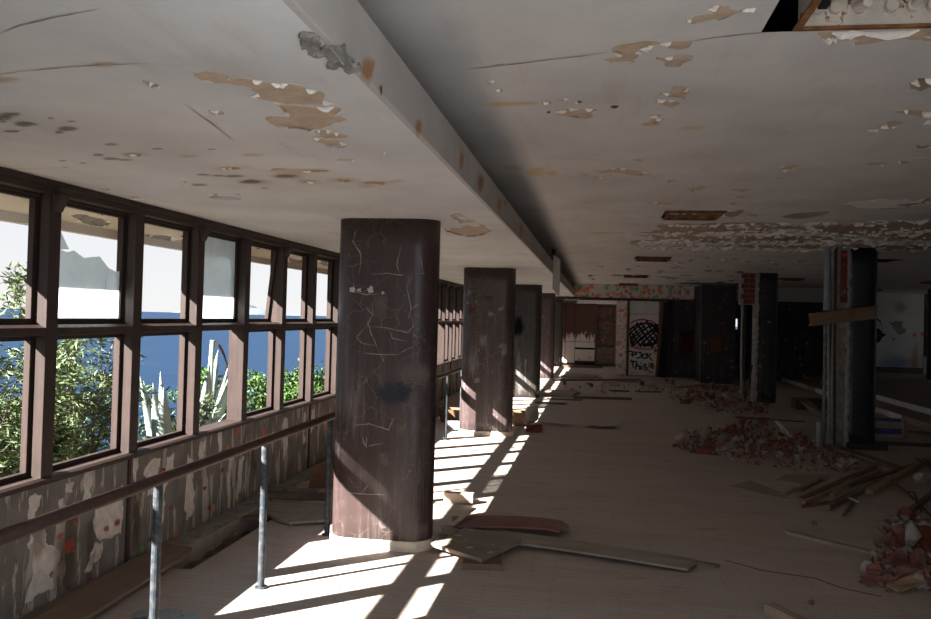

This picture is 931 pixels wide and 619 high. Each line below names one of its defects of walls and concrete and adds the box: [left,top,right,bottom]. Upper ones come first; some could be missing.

peeling [685,5,756,24]
spalling [298,31,362,75]
peeling [604,41,693,68]
peeling [909,78,931,92]
peeling [193,70,356,162]
peeling [542,98,597,119]
peeling [865,109,931,133]
peeling [443,213,491,237]
peeling [630,189,931,299]
crack [352,231,424,361]
crack [360,418,394,447]